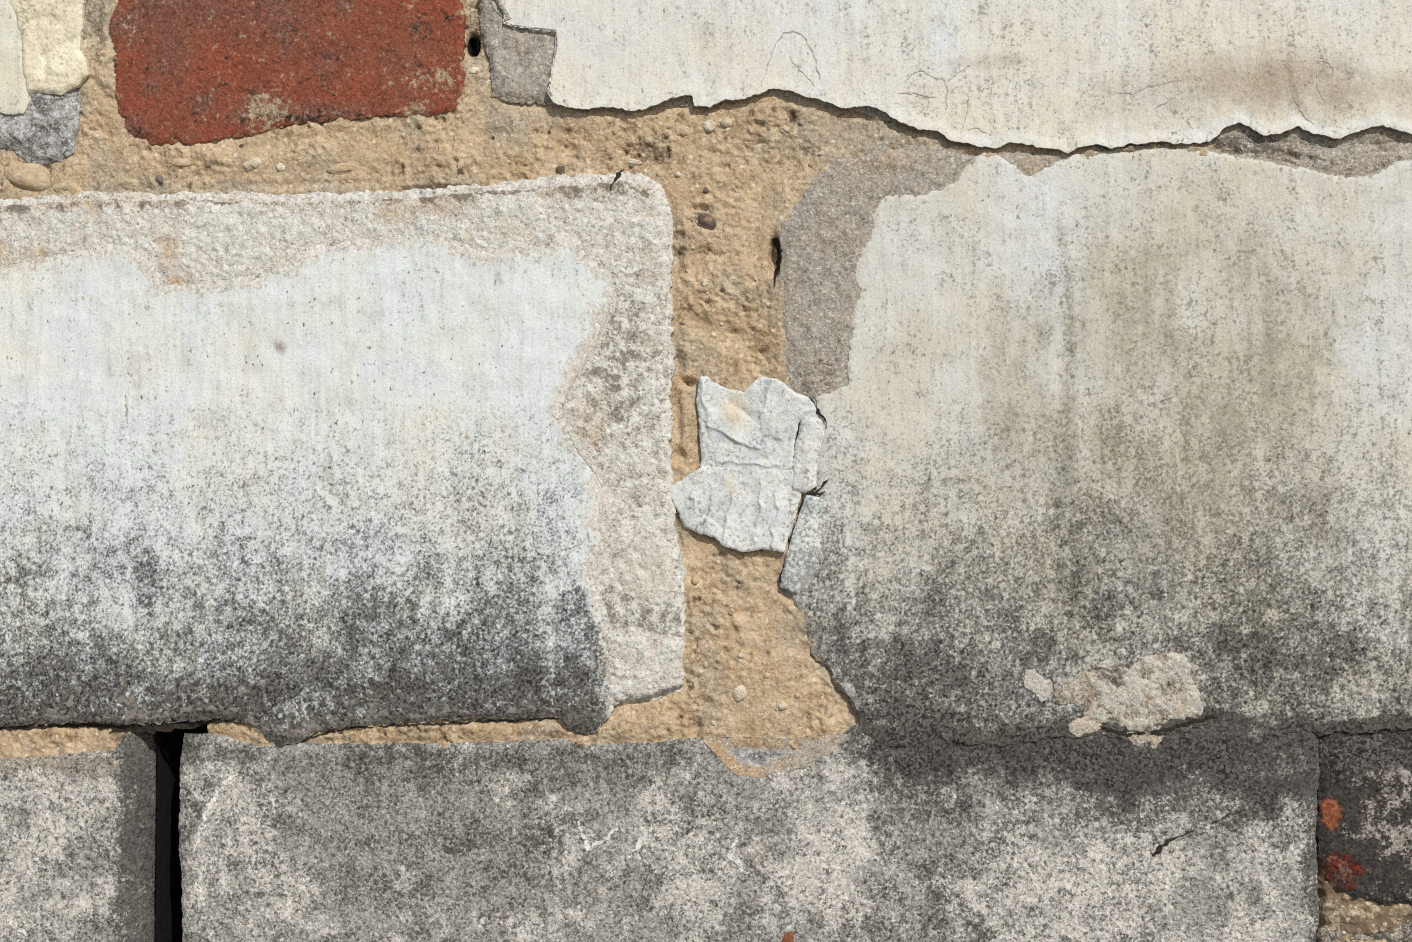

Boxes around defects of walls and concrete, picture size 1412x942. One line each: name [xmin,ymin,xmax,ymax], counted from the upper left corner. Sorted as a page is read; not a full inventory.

spalling [0,0,1412,706]
mould [0,436,633,797]
damp [800,425,1412,834]
spalling [1024,650,1205,749]